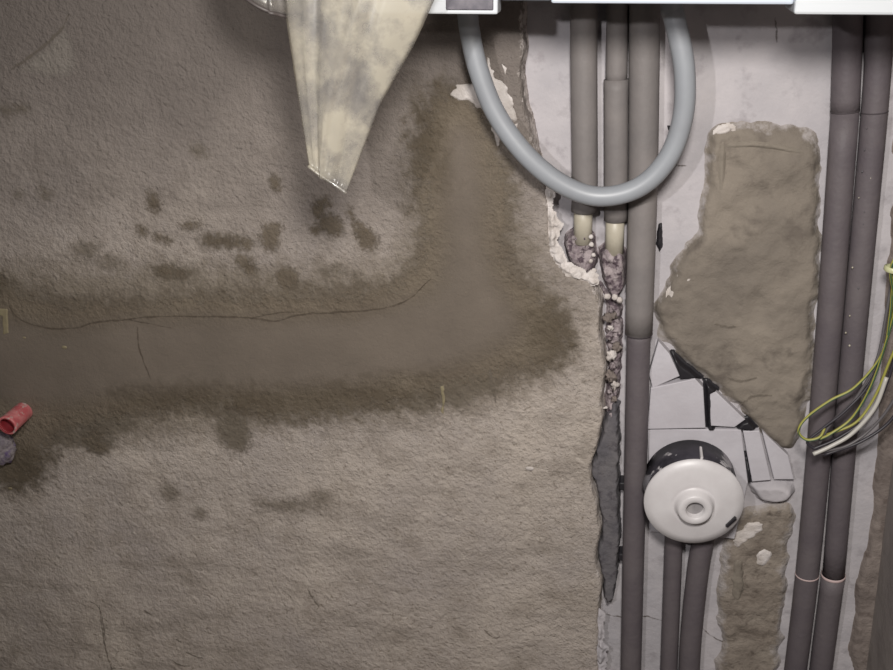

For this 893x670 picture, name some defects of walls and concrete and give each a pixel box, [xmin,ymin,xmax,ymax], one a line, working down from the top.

peeling [713,123,736,135]
crack [8,283,426,374]
damp [0,84,575,492]
spalling [545,186,624,670]
peeling [848,206,893,670]
peeling [733,522,763,547]
peeling [756,549,772,566]